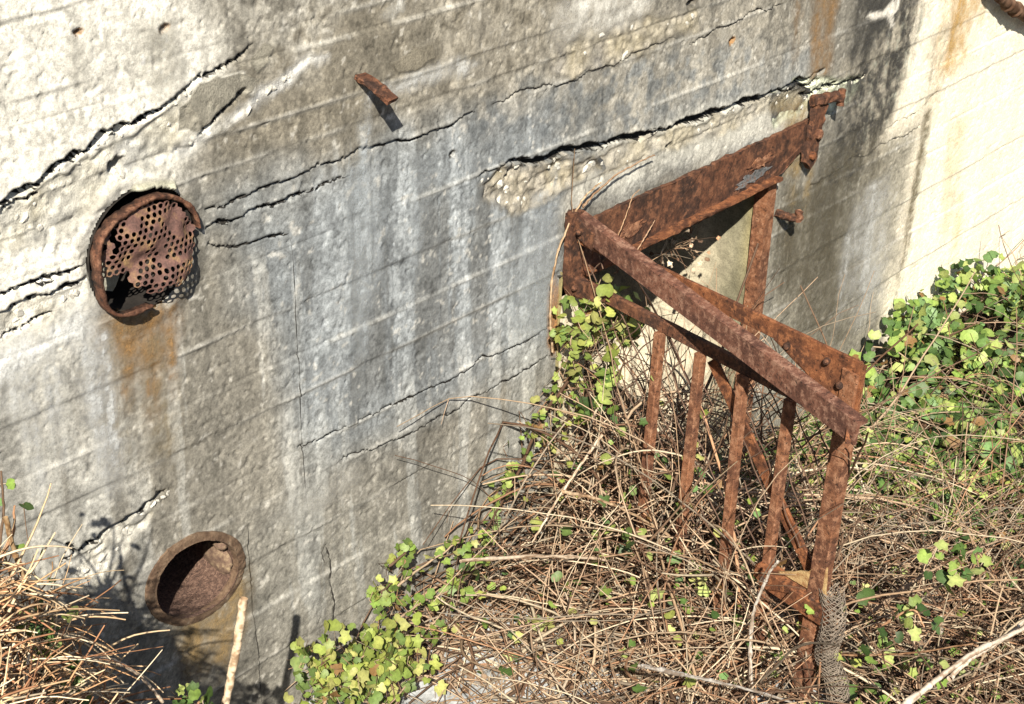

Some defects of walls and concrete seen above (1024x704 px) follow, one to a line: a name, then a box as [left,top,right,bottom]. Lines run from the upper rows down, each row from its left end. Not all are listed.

crack [0,51,244,207]
spalling [483,76,860,215]
crack [481,69,865,183]
crack [0,262,86,337]
crack [204,4,780,488]
crack [60,490,170,569]